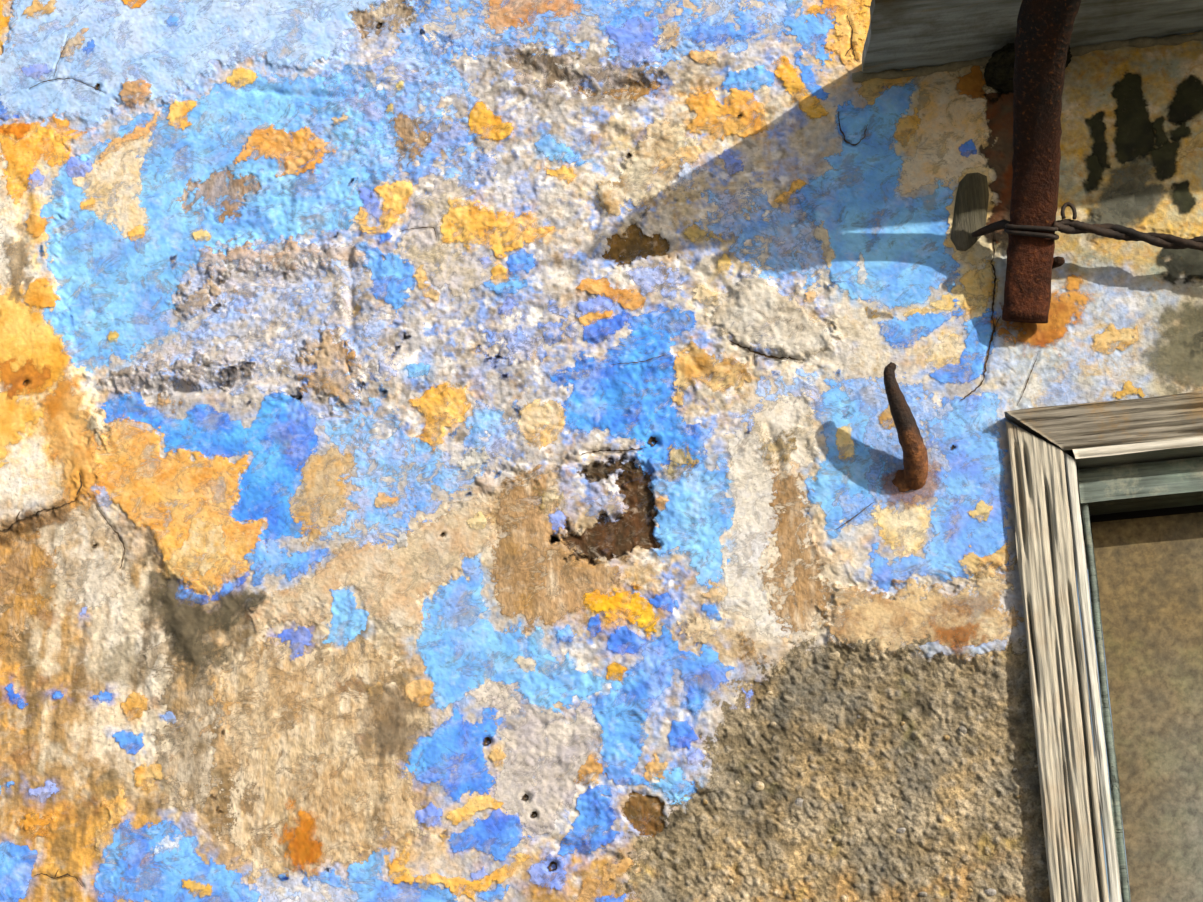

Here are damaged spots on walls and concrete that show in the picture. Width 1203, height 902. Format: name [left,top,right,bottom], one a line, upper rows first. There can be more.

peeling [0,0,872,861]
peeling [684,71,999,384]
rust [956,66,1014,244]
rust [990,274,1093,347]
leakage [1083,72,1203,239]
leakage [1143,301,1203,393]
leakage [1157,248,1203,284]
crack [0,472,125,569]
spalling [579,368,1051,902]